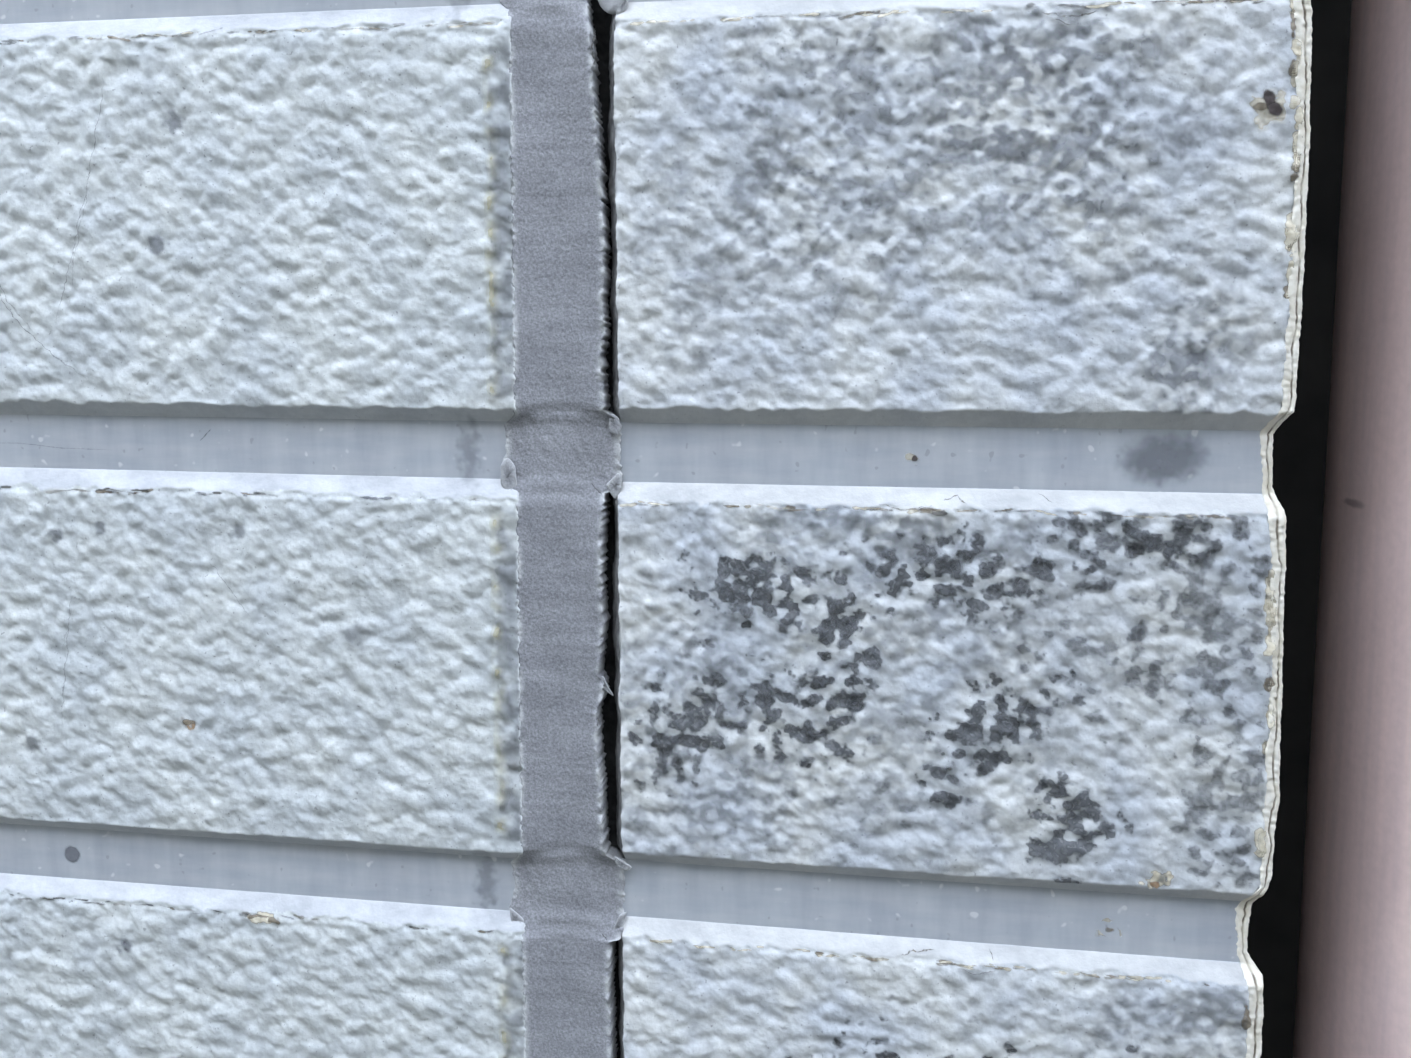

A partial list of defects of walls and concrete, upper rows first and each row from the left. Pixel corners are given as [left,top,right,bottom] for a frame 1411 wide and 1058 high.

crack [590,0,614,411]
water stain [628,511,1270,884]
water stain [876,1039,900,1058]